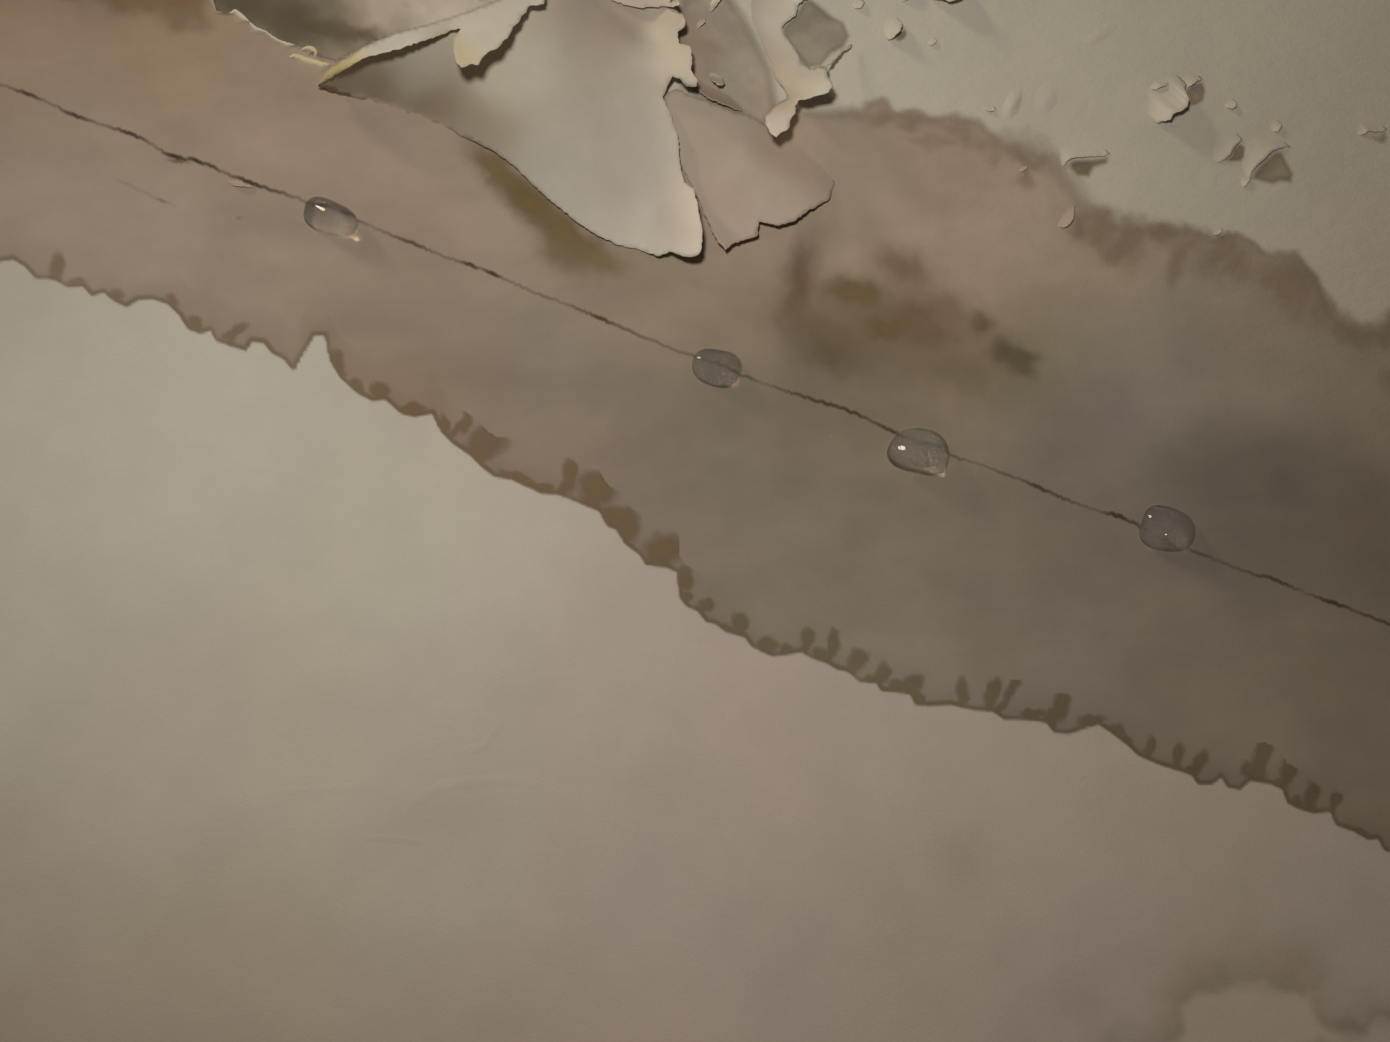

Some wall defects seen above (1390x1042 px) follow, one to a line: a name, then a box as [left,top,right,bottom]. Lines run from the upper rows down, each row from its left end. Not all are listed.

crack [120,129,270,190]
peeling [210,0,852,257]
peeling [1059,144,1110,174]
peeling [1147,73,1203,123]
peeling [1213,120,1291,188]
crack [464,262,498,277]
water stain [398,402,501,473]
crack [813,400,898,435]
water stain [582,475,638,551]
crack [1108,512,1137,524]
water stain [641,538,678,567]
water stain [1243,744,1322,812]